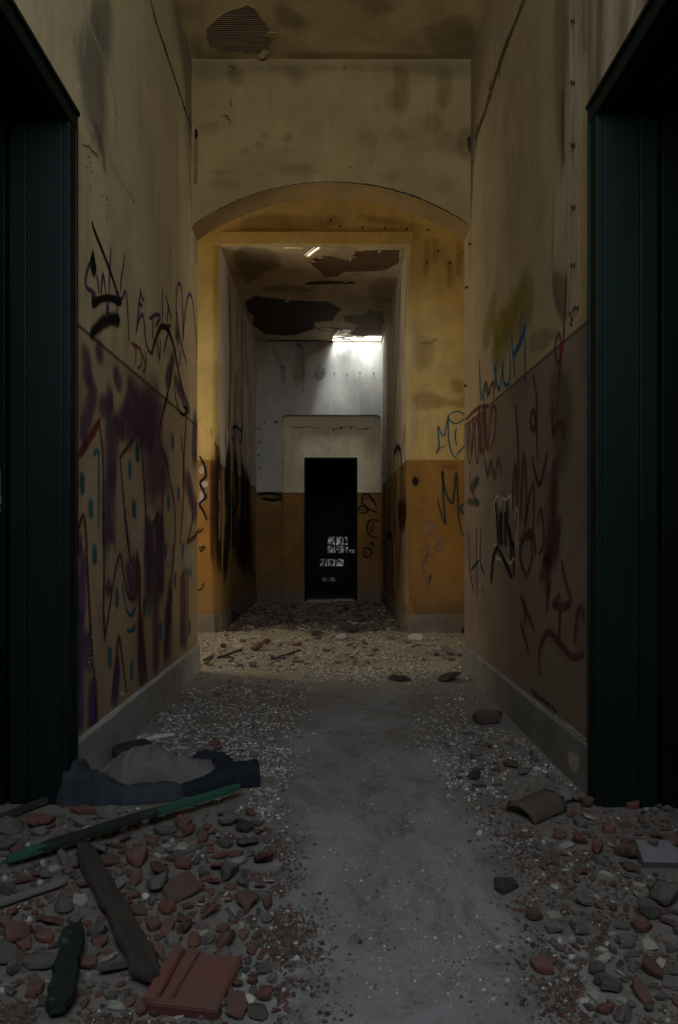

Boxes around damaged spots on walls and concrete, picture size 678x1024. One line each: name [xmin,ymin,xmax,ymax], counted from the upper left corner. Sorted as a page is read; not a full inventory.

flaking render [205,4,276,59]
flaking render [301,249,403,287]
flaking render [242,295,388,343]